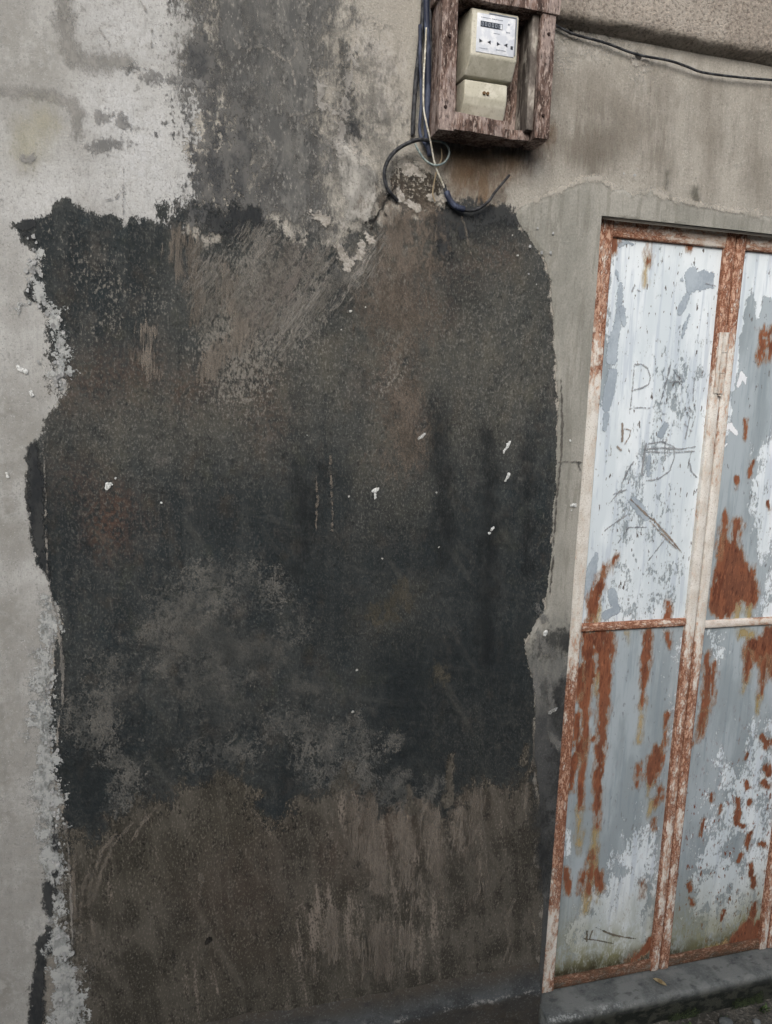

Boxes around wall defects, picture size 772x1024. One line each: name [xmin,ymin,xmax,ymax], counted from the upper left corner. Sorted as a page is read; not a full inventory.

leakage [154,0,387,385]
leakage [133,319,163,386]
leakage [532,603,570,893]
corrosion [563,554,619,913]
corrosion [634,711,671,831]
corrosion [637,601,672,743]
corrosion [692,651,717,746]
corrosion [709,509,772,713]
corrosion [759,733,772,750]
leakage [449,784,494,911]
corrosion [709,764,772,946]
leakage [298,907,423,985]